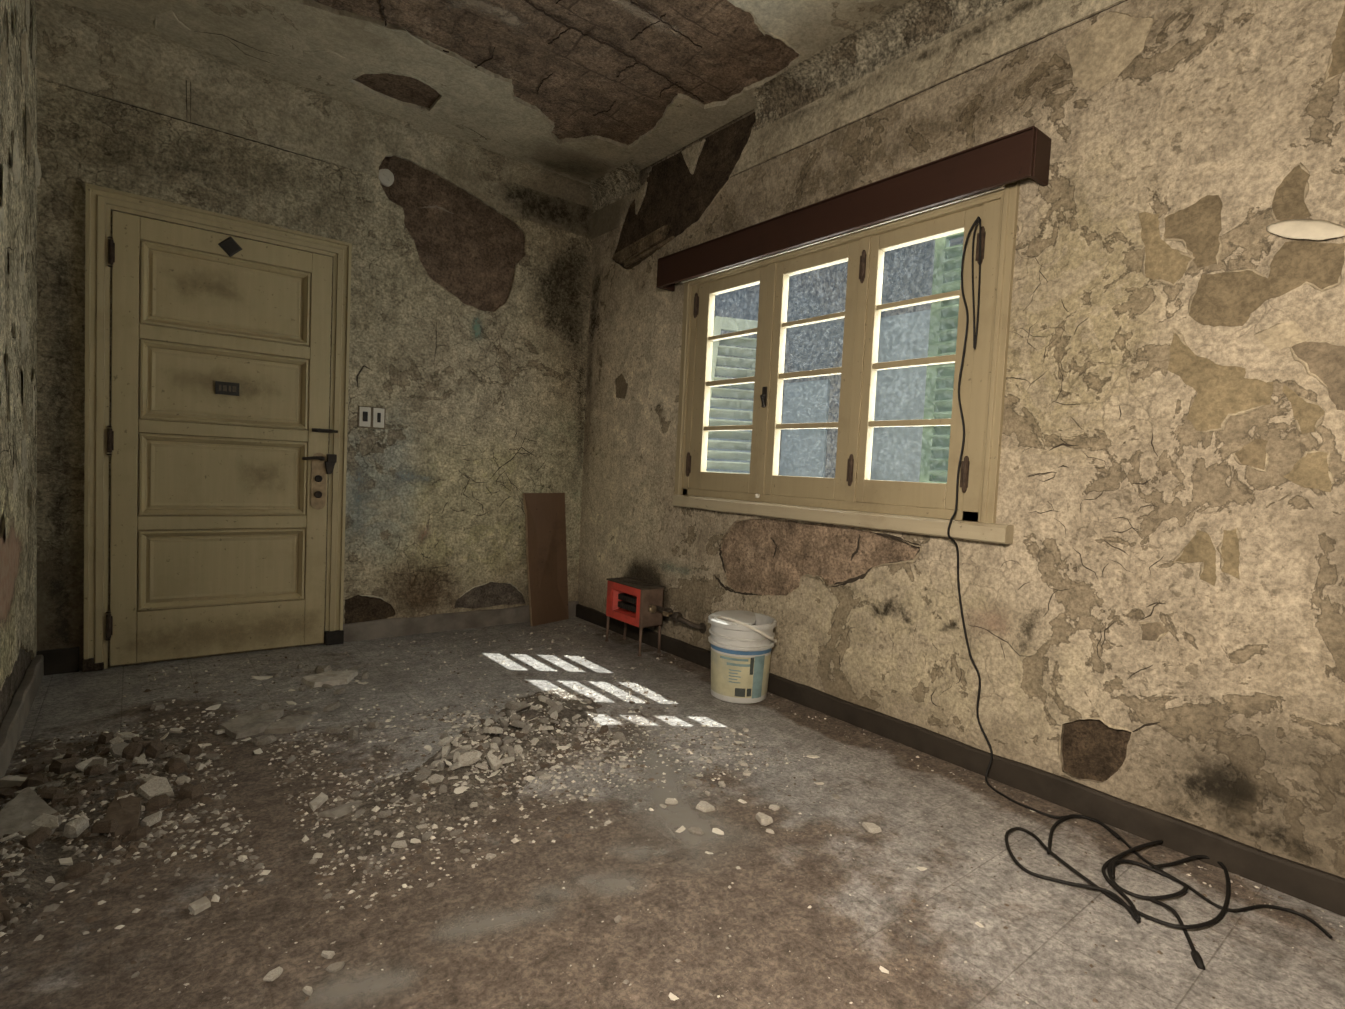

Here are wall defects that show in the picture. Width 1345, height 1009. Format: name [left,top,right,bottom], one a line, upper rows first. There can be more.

spalling [314,0,801,145]
peeling [1324,6,1345,84]
spalling [612,110,756,270]
spalling [379,156,526,312]
peeling [1139,162,1345,434]
spalling [714,518,923,596]
peeling [1172,527,1241,586]
peeling [1140,622,1169,642]
spalling [1058,717,1160,782]
water stain [1183,768,1255,806]